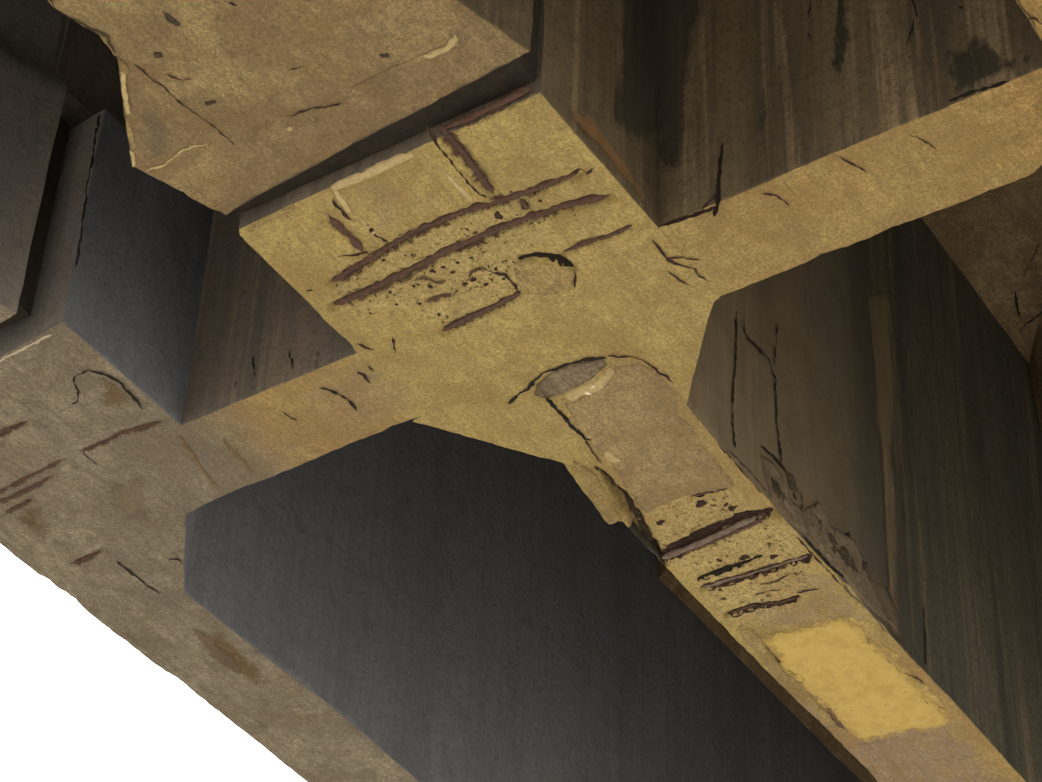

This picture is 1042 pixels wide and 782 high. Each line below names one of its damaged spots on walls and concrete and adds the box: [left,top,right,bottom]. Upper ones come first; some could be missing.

damp [948,38,1027,101]
crack [134,64,235,146]
spalling [247,204,297,232]
corrosion [328,199,389,252]
spalling [331,86,610,305]
crack [652,142,723,286]
corrosion [415,276,454,303]
spalling [437,225,633,331]
crack [71,370,143,410]
crack [726,311,782,492]
crack [116,561,160,594]
peeling [796,681,845,729]